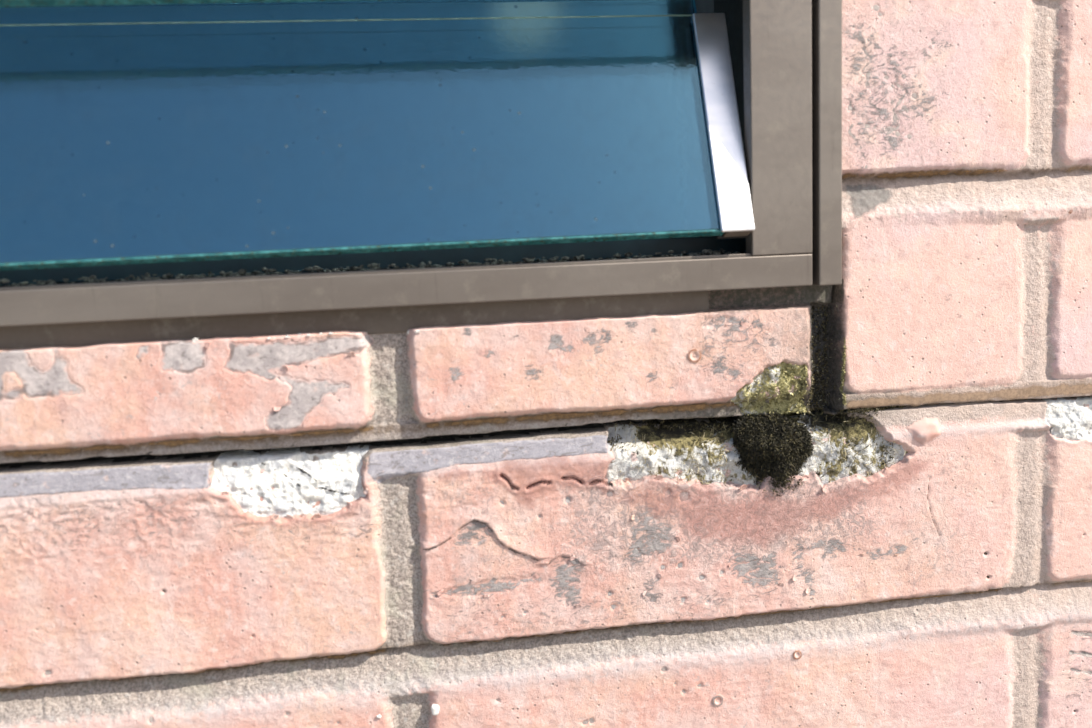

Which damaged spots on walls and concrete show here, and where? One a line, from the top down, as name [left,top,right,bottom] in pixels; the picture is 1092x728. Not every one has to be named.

peeling [0,346,84,401]
peeling [135,338,210,374]
peeling [224,332,373,430]
crack [0,419,646,468]
spalling [779,408,907,493]
spalling [1043,396,1092,441]
spalling [0,416,762,547]